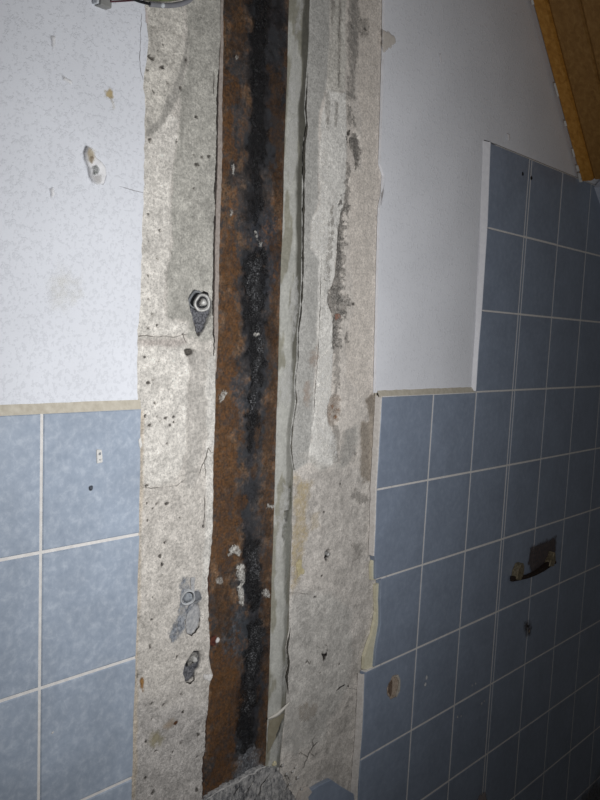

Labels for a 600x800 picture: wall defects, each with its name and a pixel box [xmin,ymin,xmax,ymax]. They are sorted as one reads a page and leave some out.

leakage [332,0,369,99]
spalling [190,301,211,337]
crack [291,73,322,470]
spalling [325,109,361,457]
spalling [183,651,199,684]
rust [203,614,240,790]
crack [284,631,292,694]
spalling [195,761,312,800]